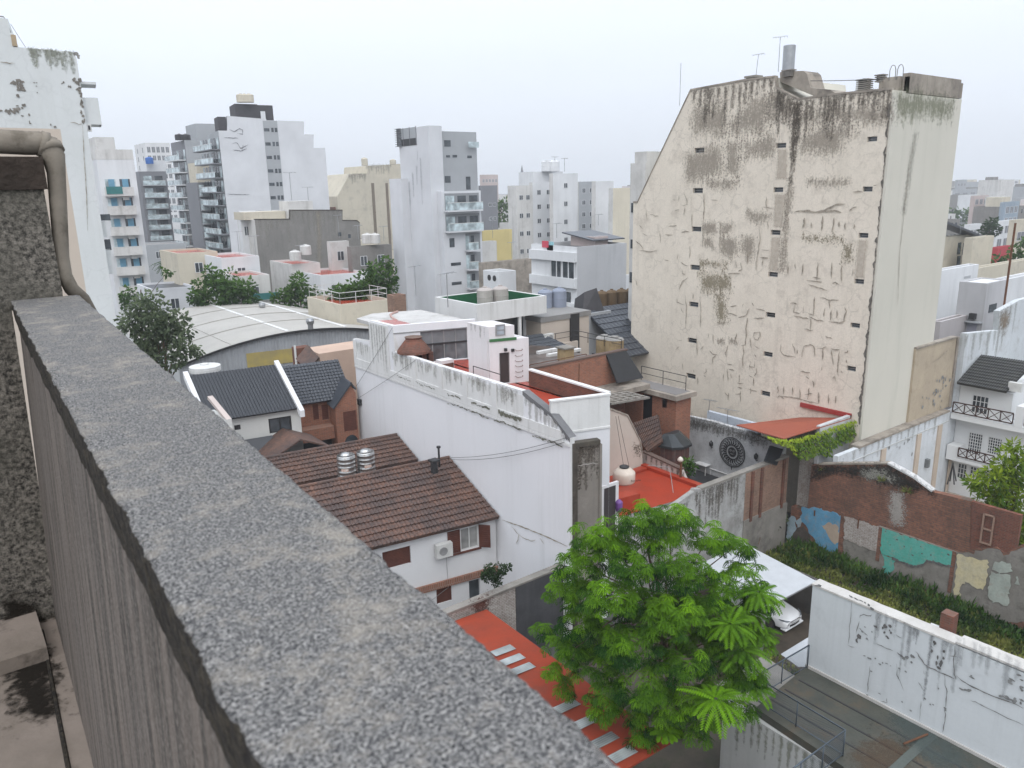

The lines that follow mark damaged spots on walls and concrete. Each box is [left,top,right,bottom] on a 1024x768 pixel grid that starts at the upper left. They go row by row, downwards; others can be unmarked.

peeling [0,79,38,124]
peeling [61,77,85,124]
water stain [687,79,954,270]
crack [795,185,876,232]
water stain [695,223,758,322]
crack [636,194,853,404]
spalling [786,507,1024,623]
water stain [3,647,62,721]
crack [848,604,1022,730]